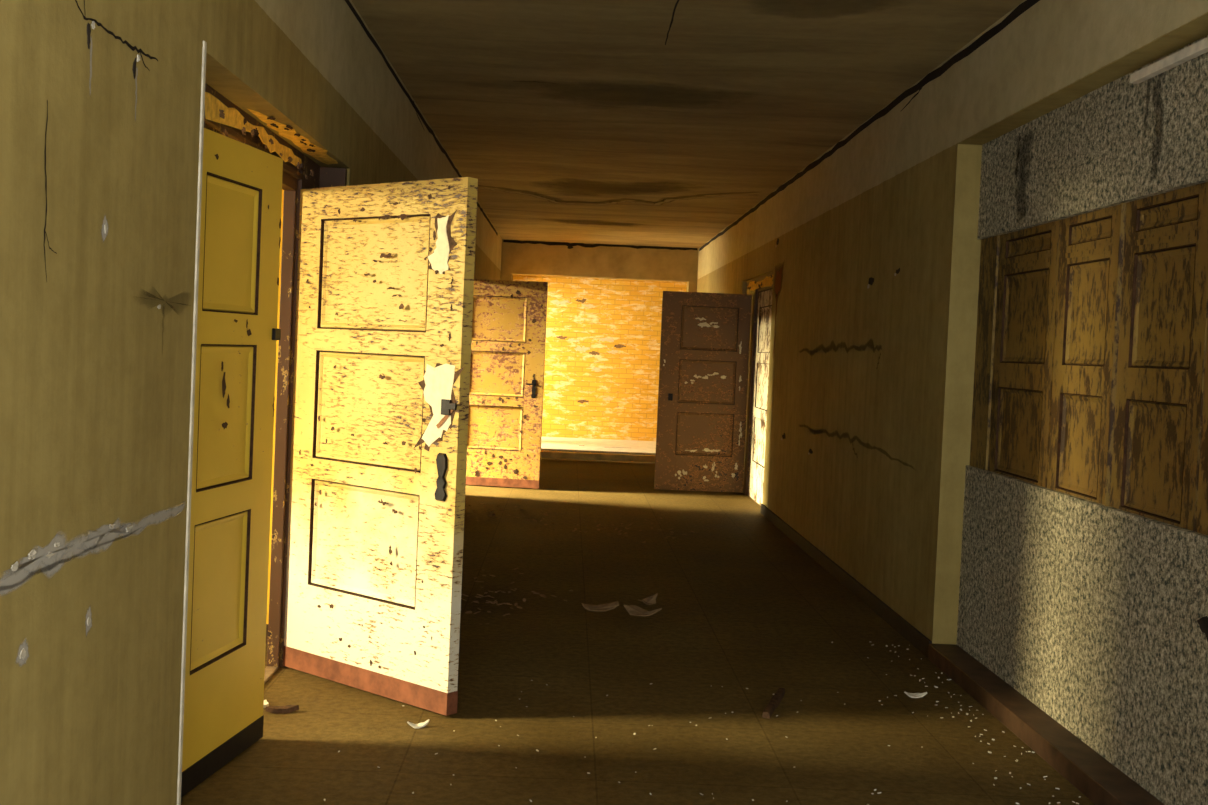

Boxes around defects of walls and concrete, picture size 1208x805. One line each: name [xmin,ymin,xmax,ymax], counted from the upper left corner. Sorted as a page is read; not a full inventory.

crack [75,0,158,71]
peeling [205,92,338,179]
crack [345,0,462,178]
crack [477,0,1040,251]
peeling [338,202,408,222]
peeling [364,253,407,322]
peeling [424,210,457,289]
peeling [221,361,230,429]
peeling [402,363,464,451]